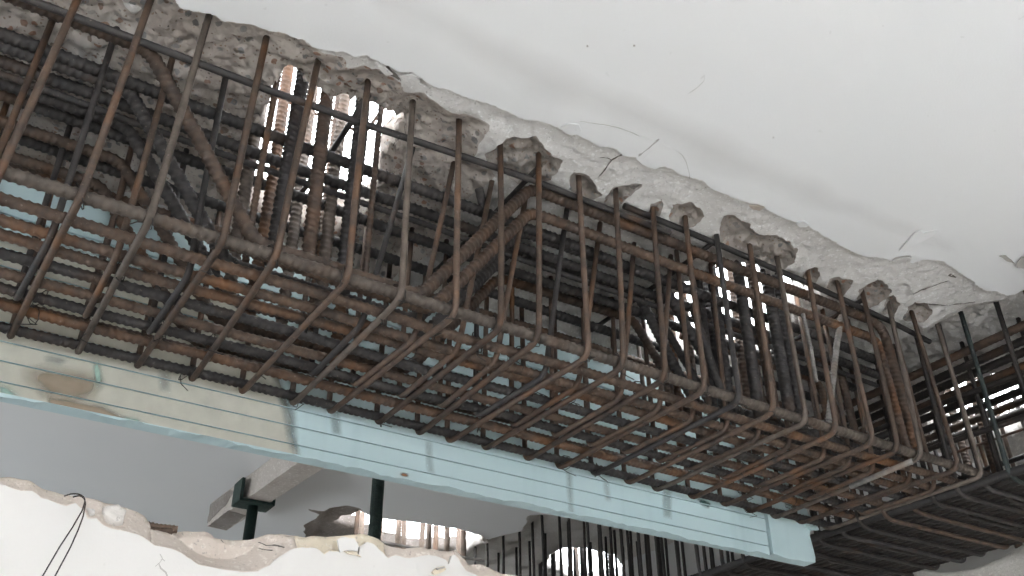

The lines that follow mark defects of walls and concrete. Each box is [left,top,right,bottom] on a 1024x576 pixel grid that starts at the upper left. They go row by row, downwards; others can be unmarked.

spalling [0,0,246,240]
spalling [43,0,1024,479]
crack [580,121,690,179]
water stain [0,241,296,454]
spalling [0,477,674,576]